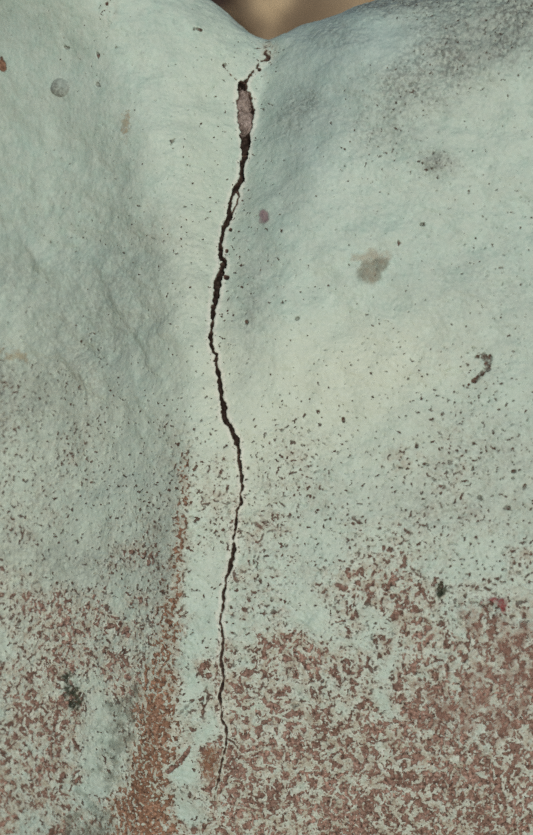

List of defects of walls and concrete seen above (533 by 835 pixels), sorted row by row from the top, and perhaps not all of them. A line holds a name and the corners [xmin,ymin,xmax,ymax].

crack [208,50,271,798]
peeling [0,350,533,835]